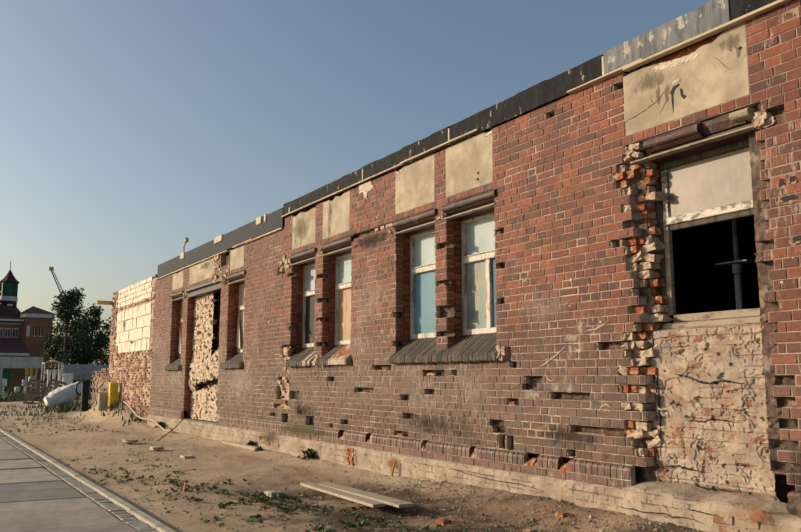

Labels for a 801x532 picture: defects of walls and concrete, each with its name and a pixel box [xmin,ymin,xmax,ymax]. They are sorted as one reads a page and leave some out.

spalling [654,51,698,73]
spalling [752,107,785,129]
spalling [610,143,663,255]
spalling [595,269,703,351]
spalling [270,344,315,426]
spalling [621,367,658,393]
spalling [487,419,514,450]